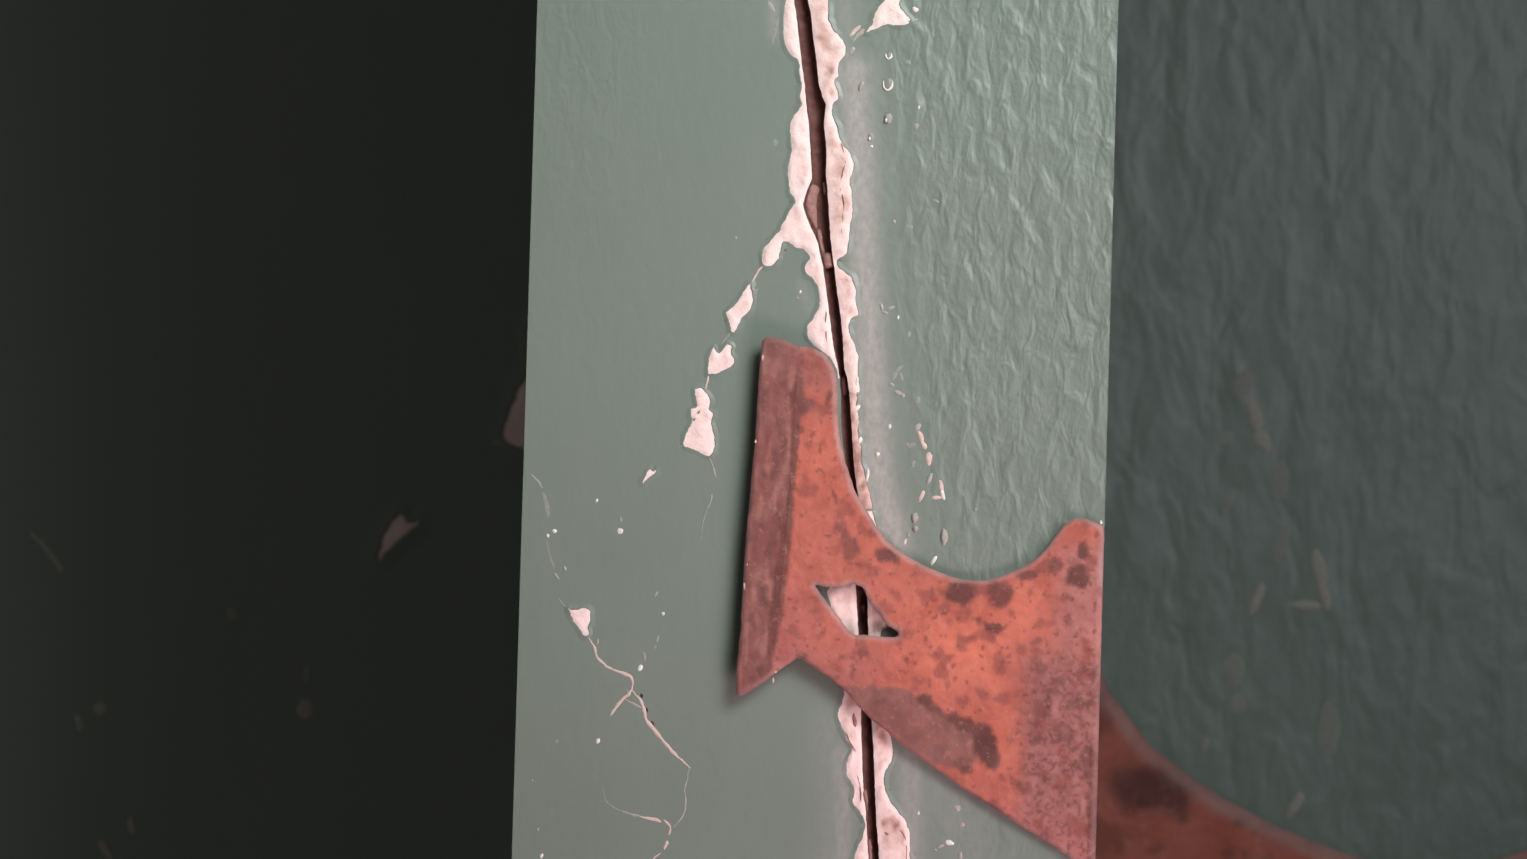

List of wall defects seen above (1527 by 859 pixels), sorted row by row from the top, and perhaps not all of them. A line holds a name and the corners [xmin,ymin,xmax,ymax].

peeling [679,0,918,541]
crack [794,0,858,496]
peeling [823,584,891,637]
crack [856,585,868,635]
crack [861,709,879,859]
peeling [833,686,916,859]
spalling [934,805,965,859]